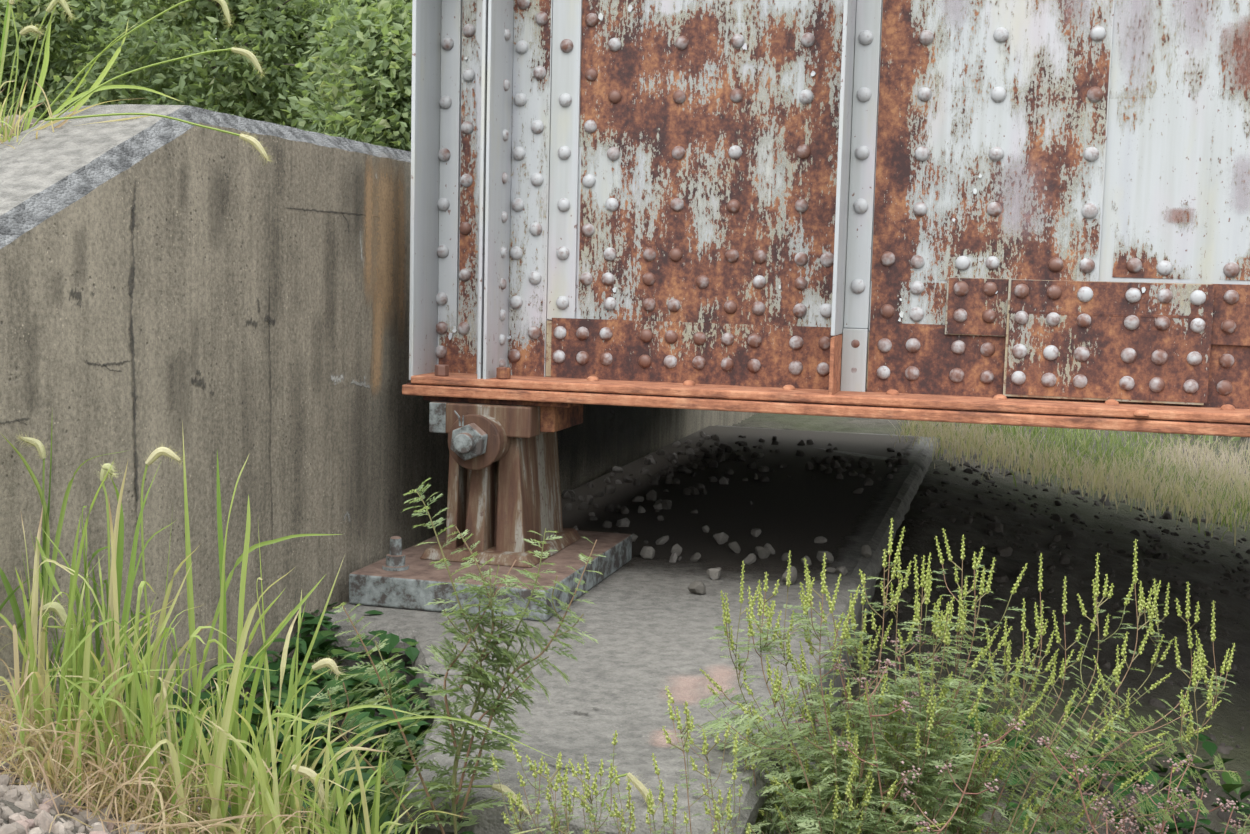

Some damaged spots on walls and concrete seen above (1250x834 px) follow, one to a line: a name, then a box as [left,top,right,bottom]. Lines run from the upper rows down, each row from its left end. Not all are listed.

rust [439,0,481,374]
rust [508,0,844,390]
rust [867,0,1250,409]